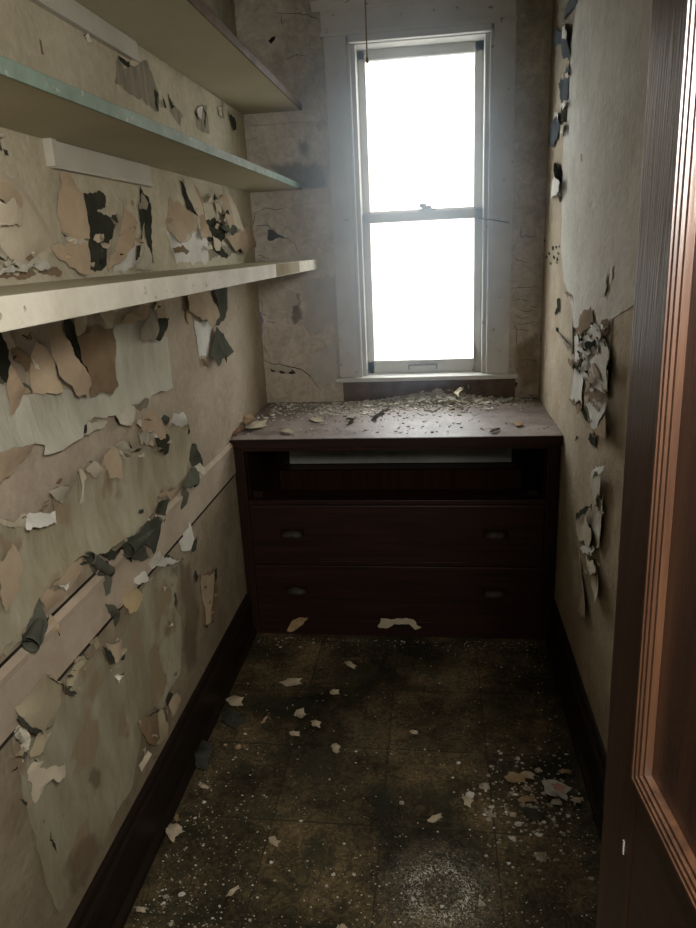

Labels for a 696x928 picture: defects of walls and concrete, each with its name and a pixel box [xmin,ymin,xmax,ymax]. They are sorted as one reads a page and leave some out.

peeling [0,171,156,280]
peeling [166,178,256,265]
peeling [267,229,286,241]
peeling [544,0,652,447]
peeling [185,287,234,367]
peeling [232,414,268,436]
peeling [575,466,604,617]
peeling [0,300,207,912]
peeling [194,567,218,628]